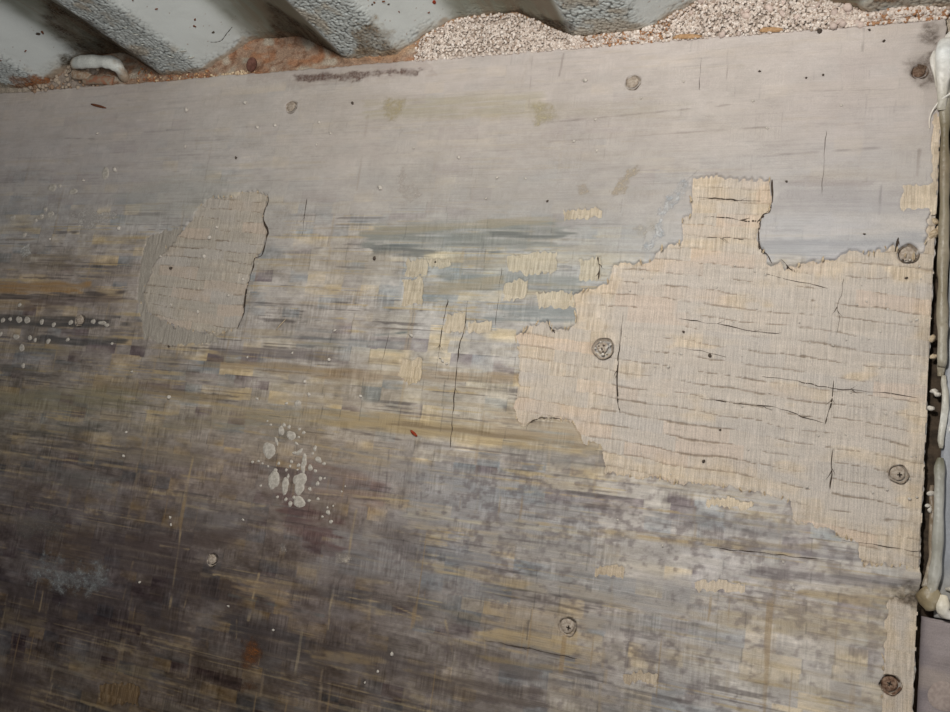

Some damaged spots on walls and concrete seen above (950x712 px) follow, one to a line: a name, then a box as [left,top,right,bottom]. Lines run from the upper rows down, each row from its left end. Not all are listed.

rust [13,75,50,88]
rust [36,0,257,84]
peeling [141,191,268,334]
crack [435,301,468,447]
peeling [443,312,492,334]
crack [614,318,623,412]
peeling [503,113,940,569]
crack [827,451,835,488]